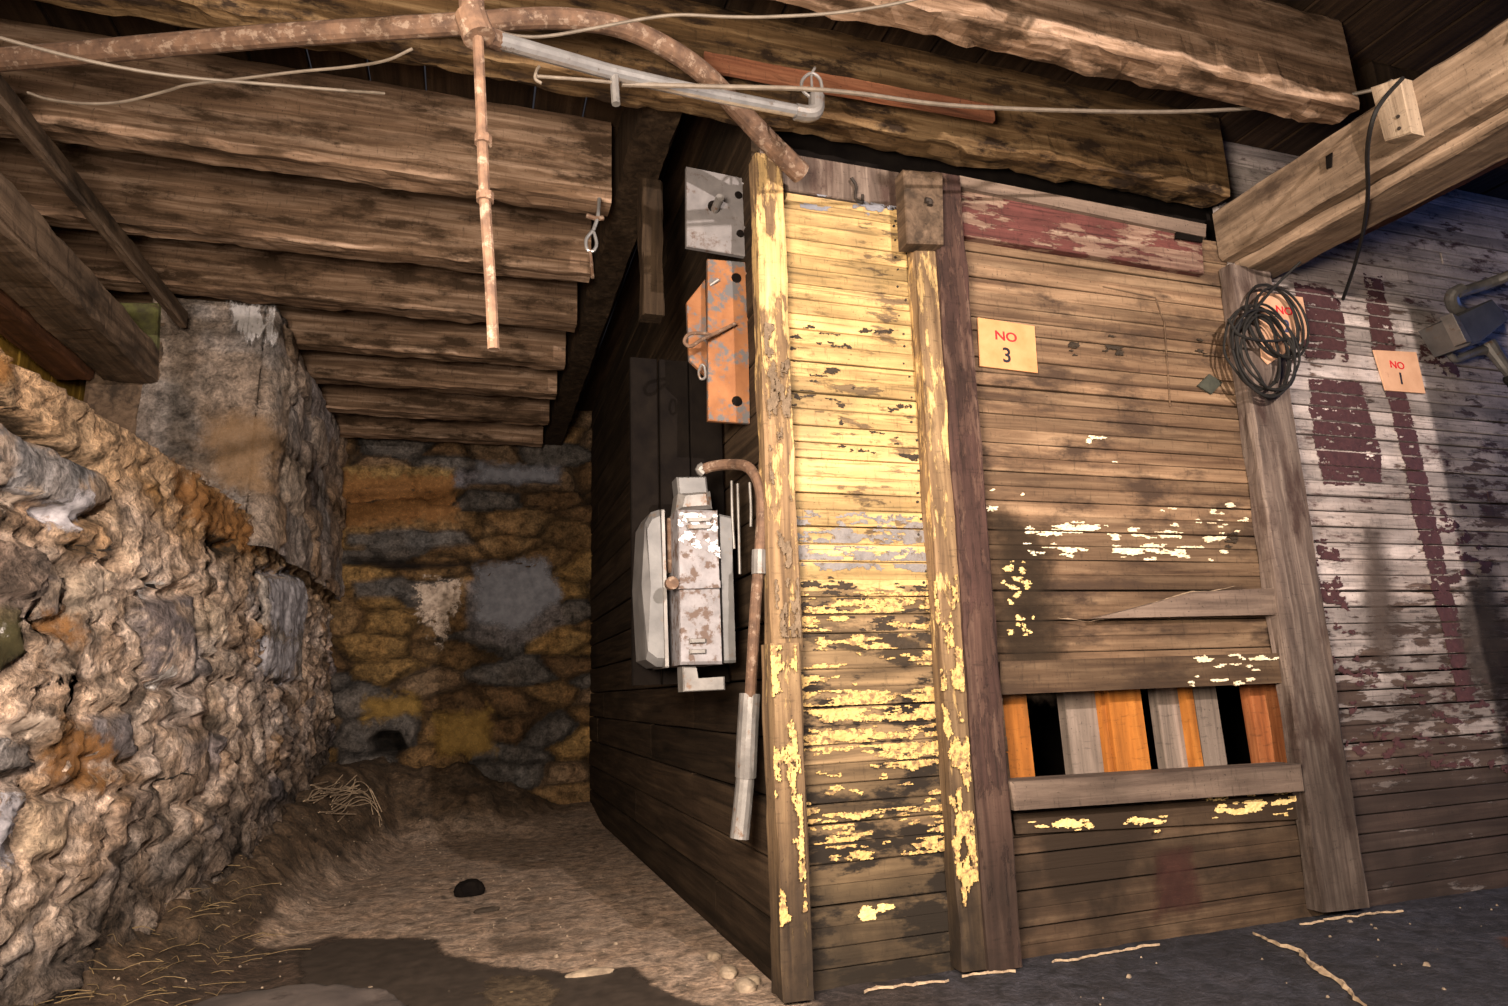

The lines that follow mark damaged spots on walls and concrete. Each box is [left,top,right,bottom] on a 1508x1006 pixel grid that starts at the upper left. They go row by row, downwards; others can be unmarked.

peeling [764,322,894,485]
peeling [837,431,919,461]
peeling [1000,502,1249,636]
peeling [1315,538,1356,635]
peeling [1417,504,1493,597]
peeling [770,495,979,927]
peeling [1332,655,1379,715]
peeling [1345,664,1508,774]
peeling [1028,818,1095,831]
peeling [1123,815,1168,833]
peeling [1205,792,1297,819]
crack [1253,910,1404,1006]